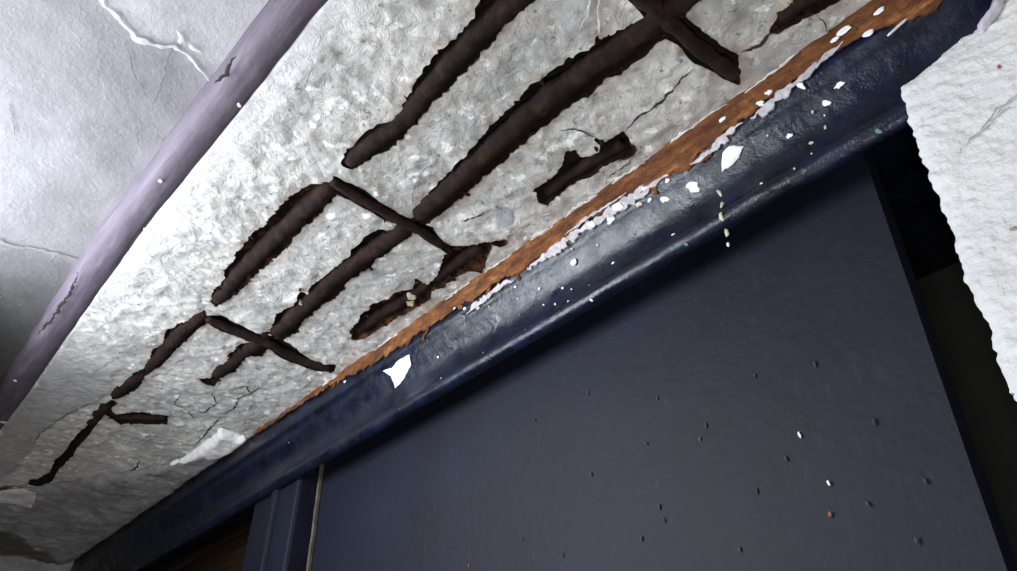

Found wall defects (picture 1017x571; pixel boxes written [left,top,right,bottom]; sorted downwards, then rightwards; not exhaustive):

crack [128,34,176,151]
spalling [28,0,852,486]
rust [249,0,942,439]
crack [31,395,106,445]
crack [130,386,262,471]